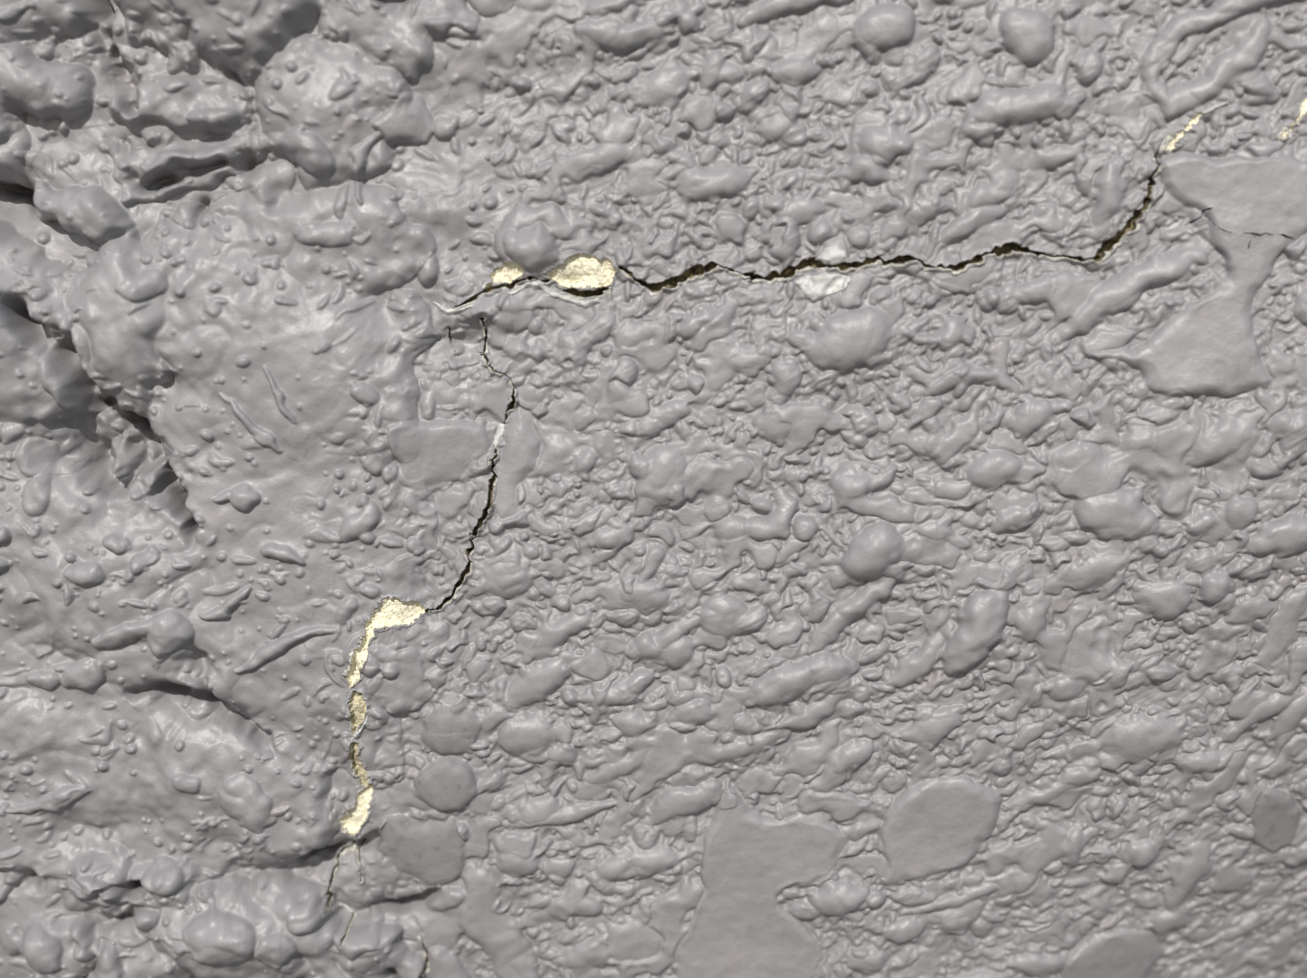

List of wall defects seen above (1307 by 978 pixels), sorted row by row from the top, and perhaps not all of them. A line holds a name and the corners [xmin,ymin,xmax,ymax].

crack [615,136,1166,302]
crack [1185,205,1299,255]
crack [425,314,520,616]
crack [319,837,368,950]
crack [414,933,432,978]